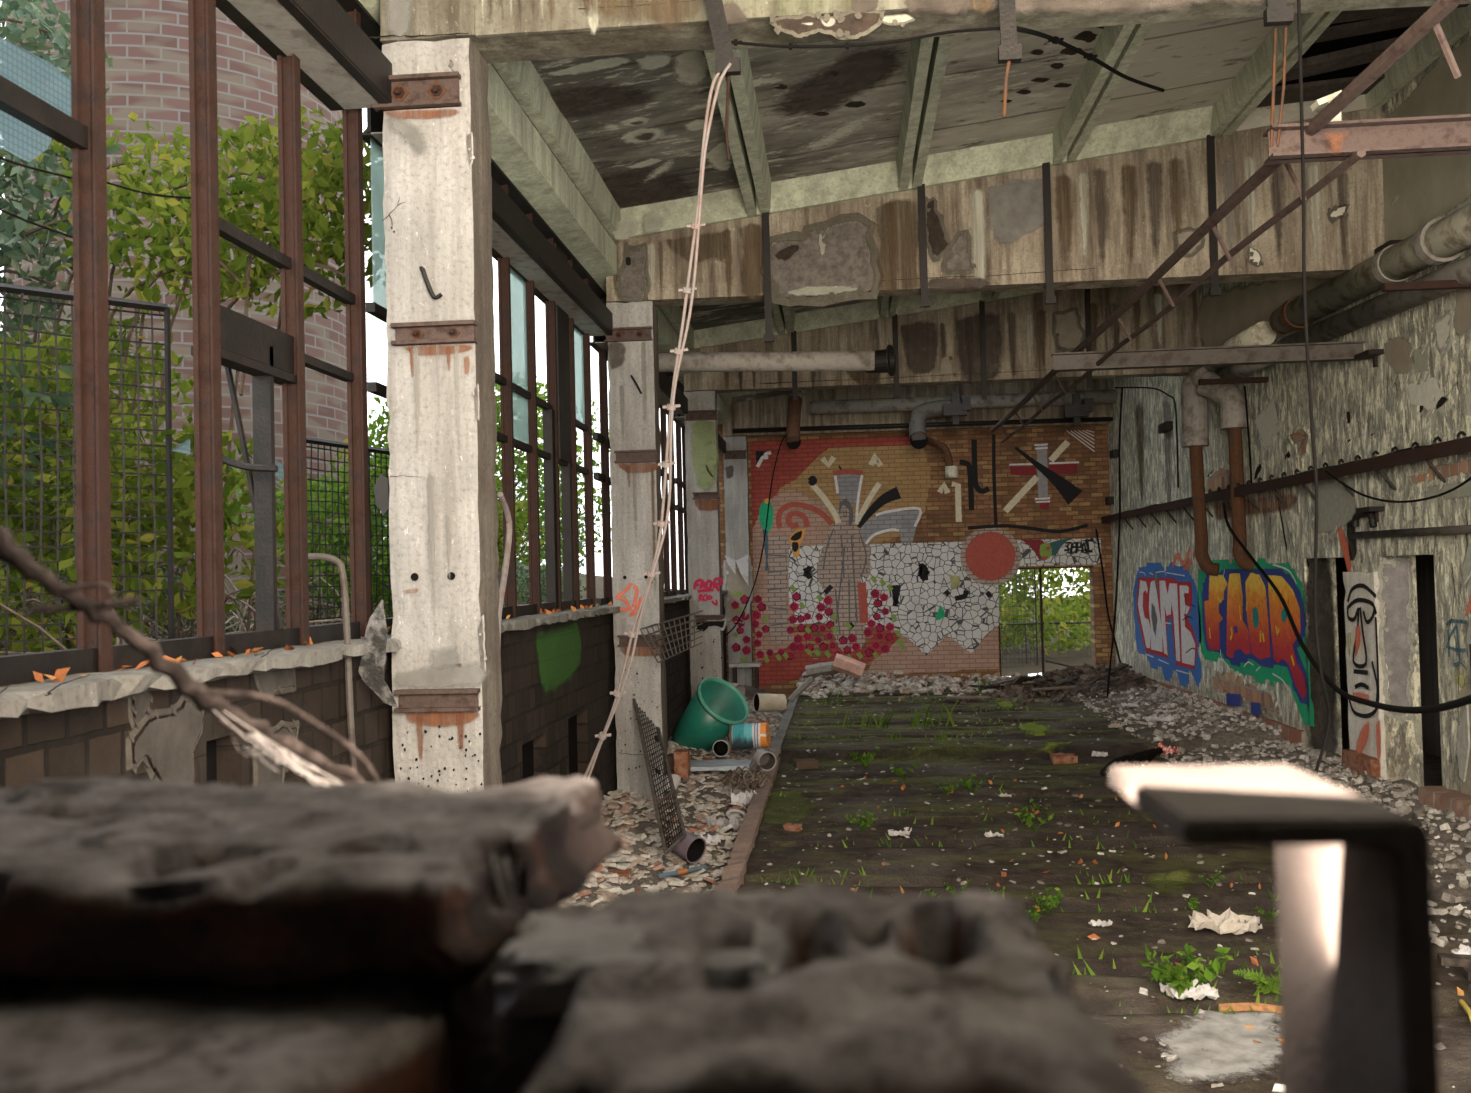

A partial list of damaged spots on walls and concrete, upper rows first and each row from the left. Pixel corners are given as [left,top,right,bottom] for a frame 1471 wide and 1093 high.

leakage [548,50,708,85]
leakage [620,117,673,180]
leakage [802,115,876,151]
leakage [876,159,1185,292]
spalling [762,212,881,306]
peeling [1431,308,1454,355]
corrosion [405,345,472,376]
peeling [1404,372,1449,416]
flaking render [1410,455,1471,505]
corrosion [1214,494,1297,519]
corrosion [407,711,478,758]
flaking render [1458,705,1470,782]